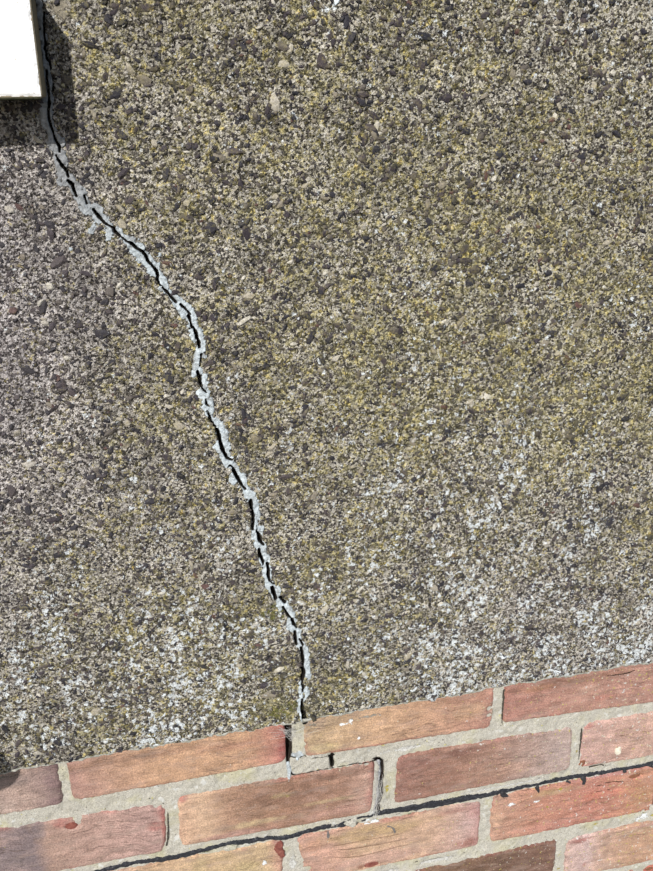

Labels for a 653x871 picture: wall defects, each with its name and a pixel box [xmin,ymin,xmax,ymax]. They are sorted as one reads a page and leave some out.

crack [35,0,312,725]
crack [499,689,507,723]
crack [290,753,376,775]
crack [578,728,624,794]
crack [163,812,171,846]
crack [334,833,408,858]